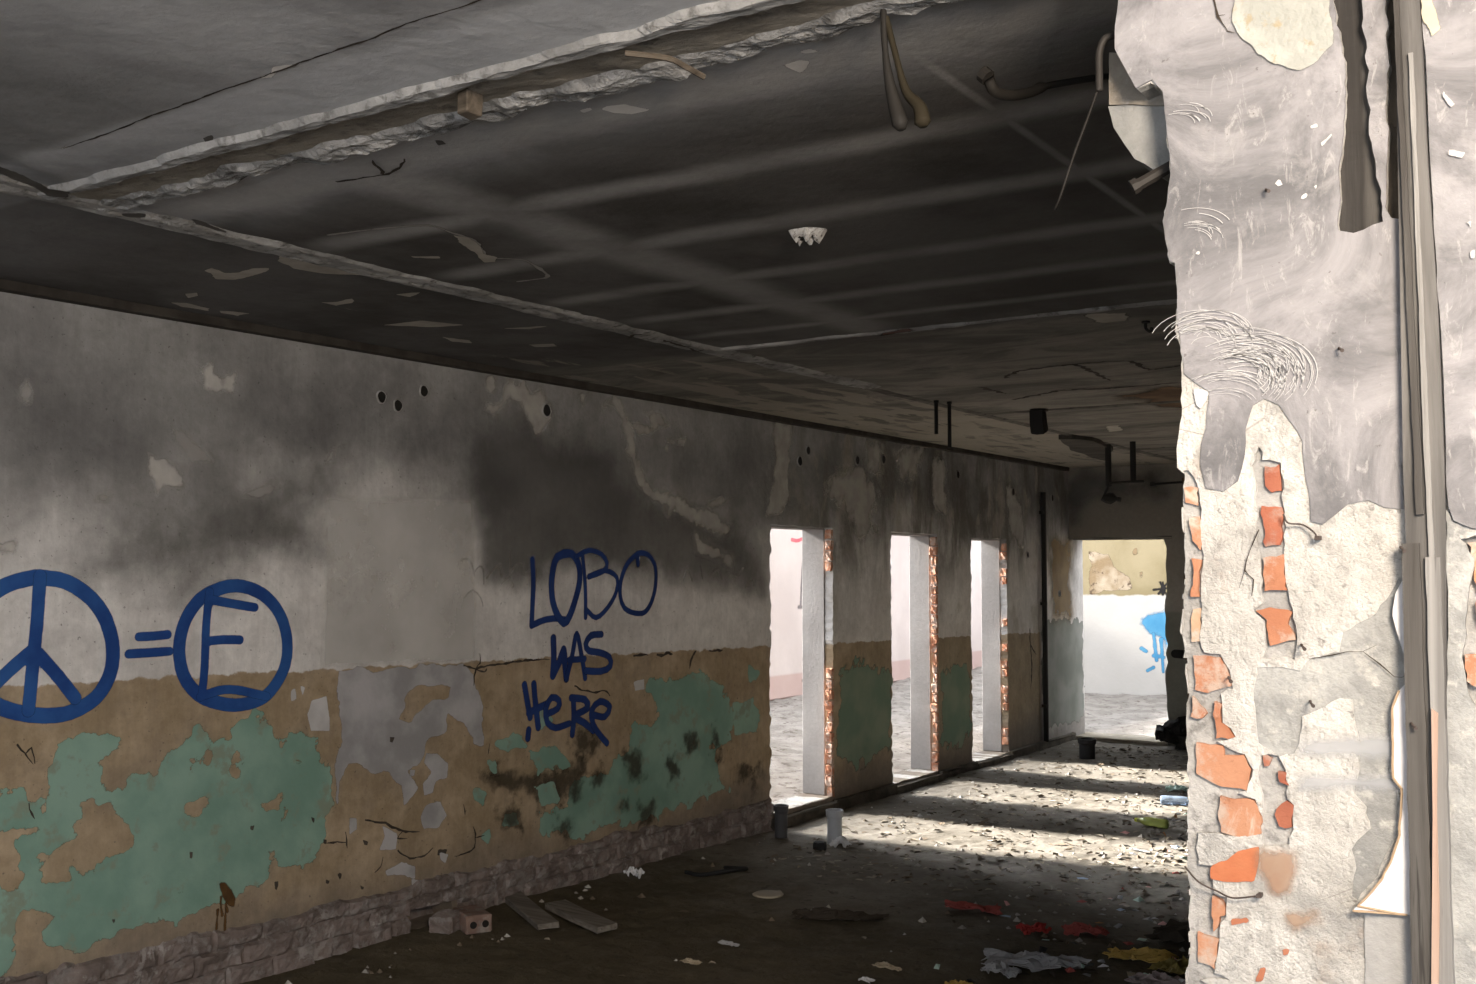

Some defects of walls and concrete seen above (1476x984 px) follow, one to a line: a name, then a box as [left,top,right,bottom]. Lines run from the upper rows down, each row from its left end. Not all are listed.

peeling [1232,0,1334,70]
crack [65,0,480,148]
flaking render [37,0,966,218]
peeling [205,256,358,280]
flaking render [203,363,236,392]
peeling [1194,389,1208,409]
flaking render [149,456,183,492]
flaking render [421,753,448,829]
peeling [487,665,760,841]
flaking render [1182,448,1412,984]
peeling [0,686,335,977]
flaking render [349,818,417,885]